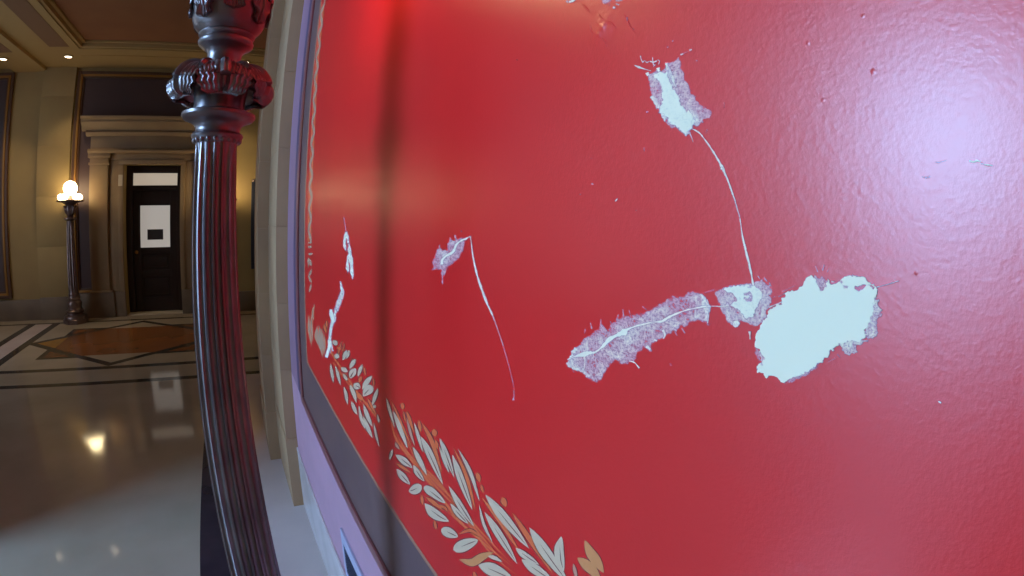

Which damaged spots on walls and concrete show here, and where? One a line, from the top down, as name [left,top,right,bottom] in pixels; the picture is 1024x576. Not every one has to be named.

crack [689,128,754,286]
crack [440,236,514,399]